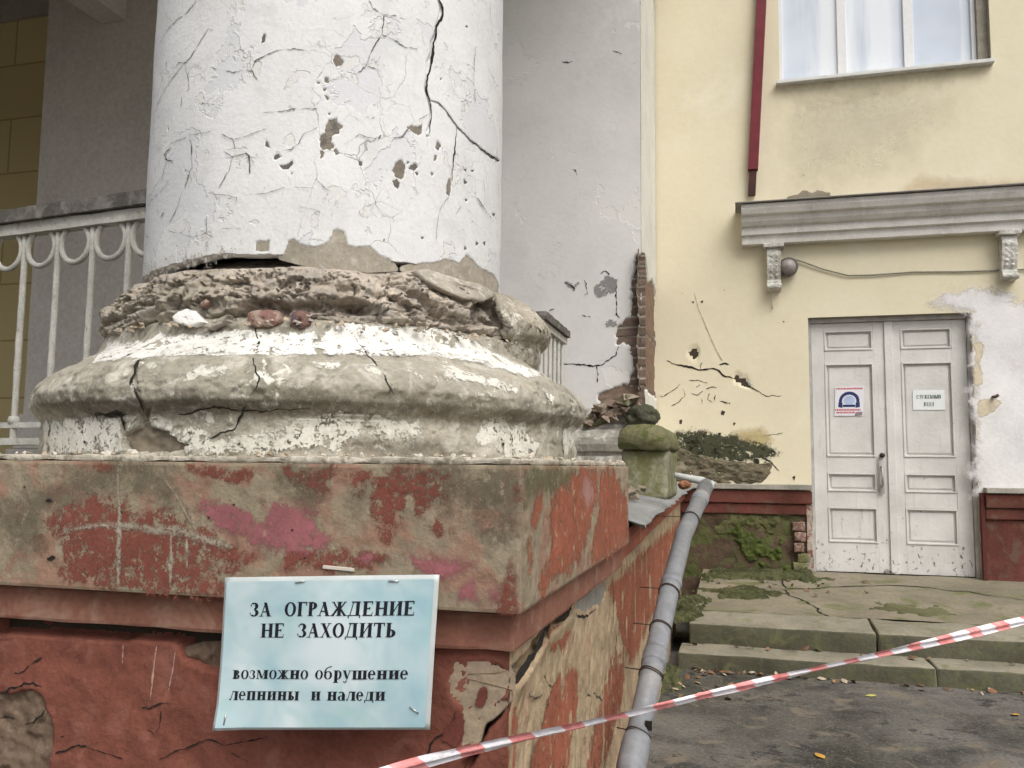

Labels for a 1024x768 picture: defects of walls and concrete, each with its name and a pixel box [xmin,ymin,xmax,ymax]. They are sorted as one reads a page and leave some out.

crack [145,108,331,237]
crack [344,0,499,239]
crack [178,327,311,444]
spalling [92,230,554,406]
peeling [565,276,617,298]
crack [565,346,619,382]
spalling [598,249,656,406]
crack [662,297,776,406]
peeling [39,408,453,607]
crack [508,606,596,700]
spalling [0,690,54,768]
spalling [442,661,518,768]